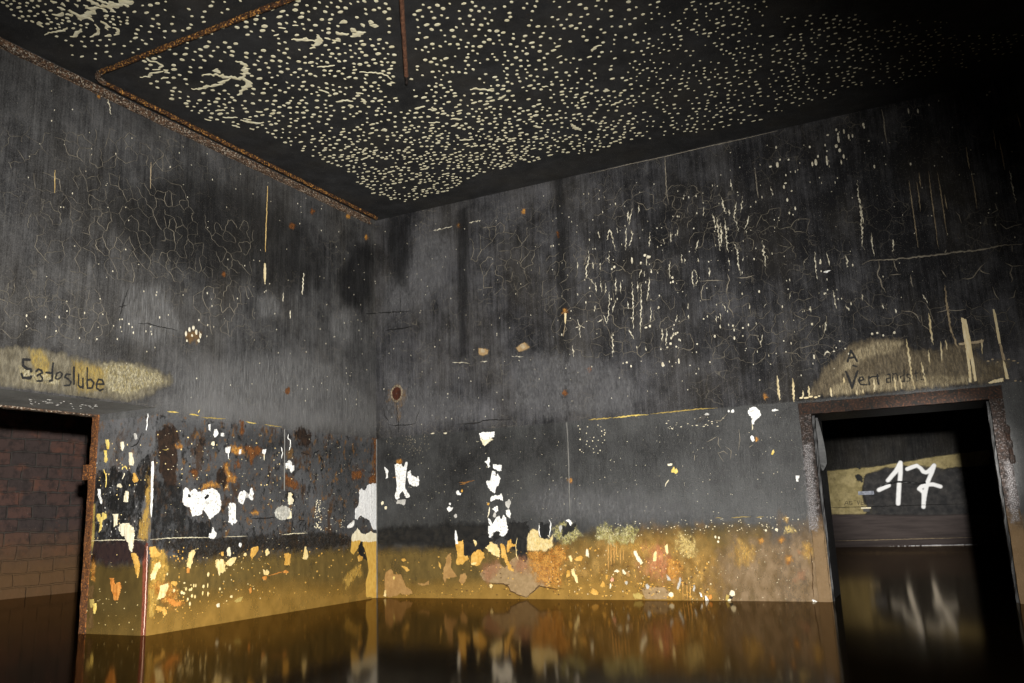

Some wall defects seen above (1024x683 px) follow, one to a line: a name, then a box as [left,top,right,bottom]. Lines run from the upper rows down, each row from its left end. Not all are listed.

crack [0,128,255,343]
crack [433,131,1021,367]
rust [87,505,96,629]
rust [189,420,262,490]
rust [288,427,313,458]
peeling [89,407,804,625]